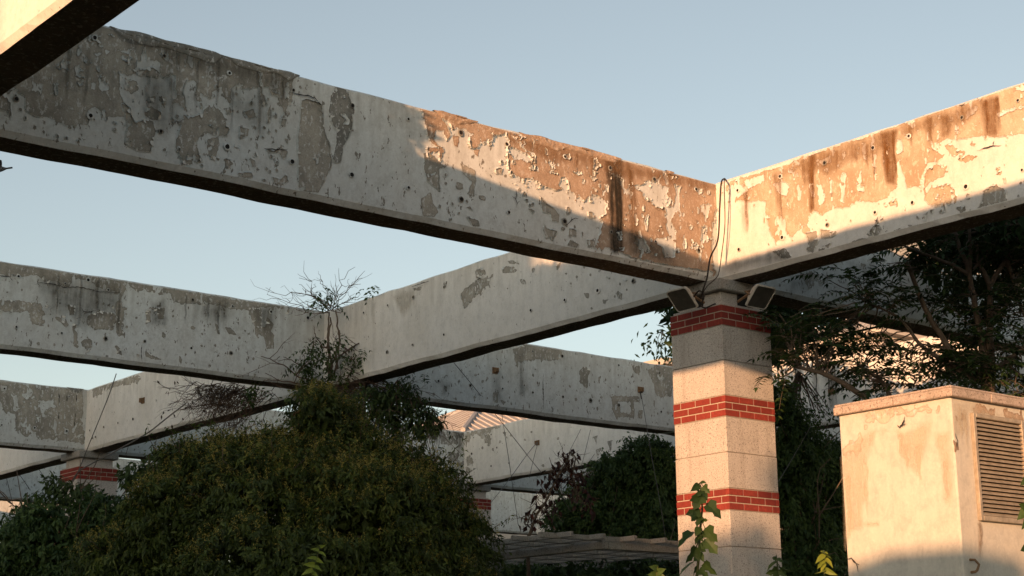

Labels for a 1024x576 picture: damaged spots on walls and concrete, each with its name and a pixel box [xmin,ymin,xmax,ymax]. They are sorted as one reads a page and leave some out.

peeling [0,26,355,193]
rust [982,98,999,133]
peeling [420,84,1024,277]
rust [806,149,854,210]
rust [881,131,897,182]
peeling [460,260,535,309]
peeling [513,344,562,368]
peeling [0,375,141,445]
peeling [569,364,674,419]